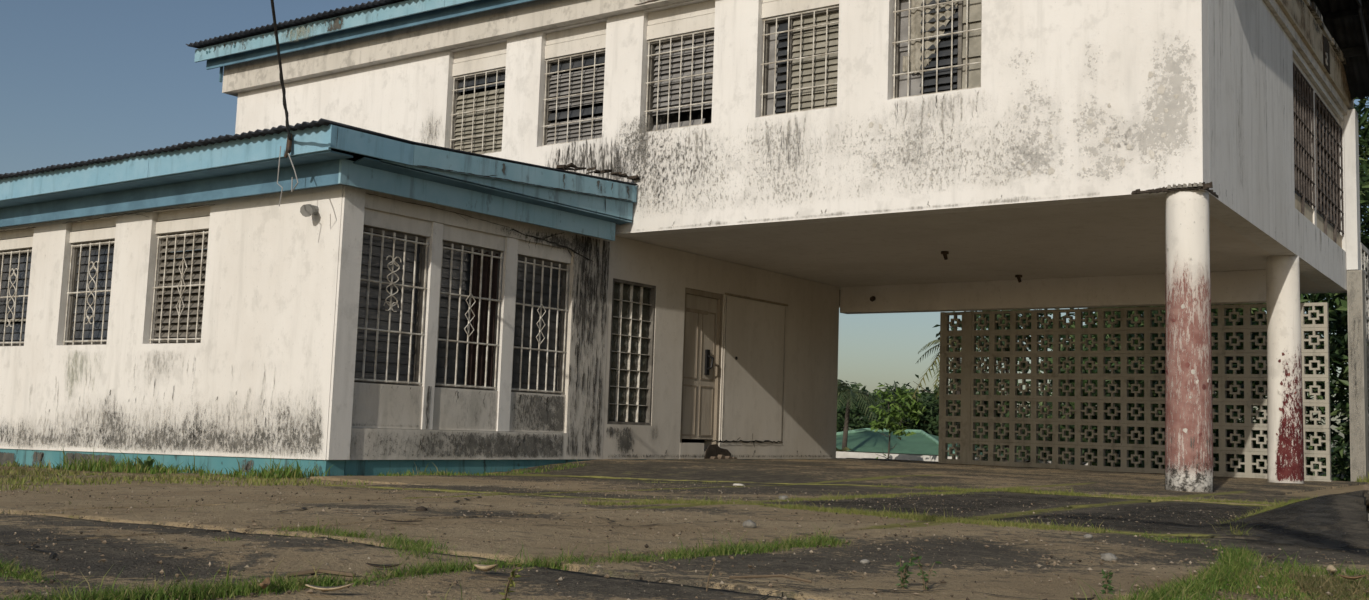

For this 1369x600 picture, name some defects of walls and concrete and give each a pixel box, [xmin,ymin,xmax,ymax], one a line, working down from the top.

damp [547,114,731,225]
damp [745,92,1032,208]
damp [367,227,704,458]
damp [0,352,322,454]